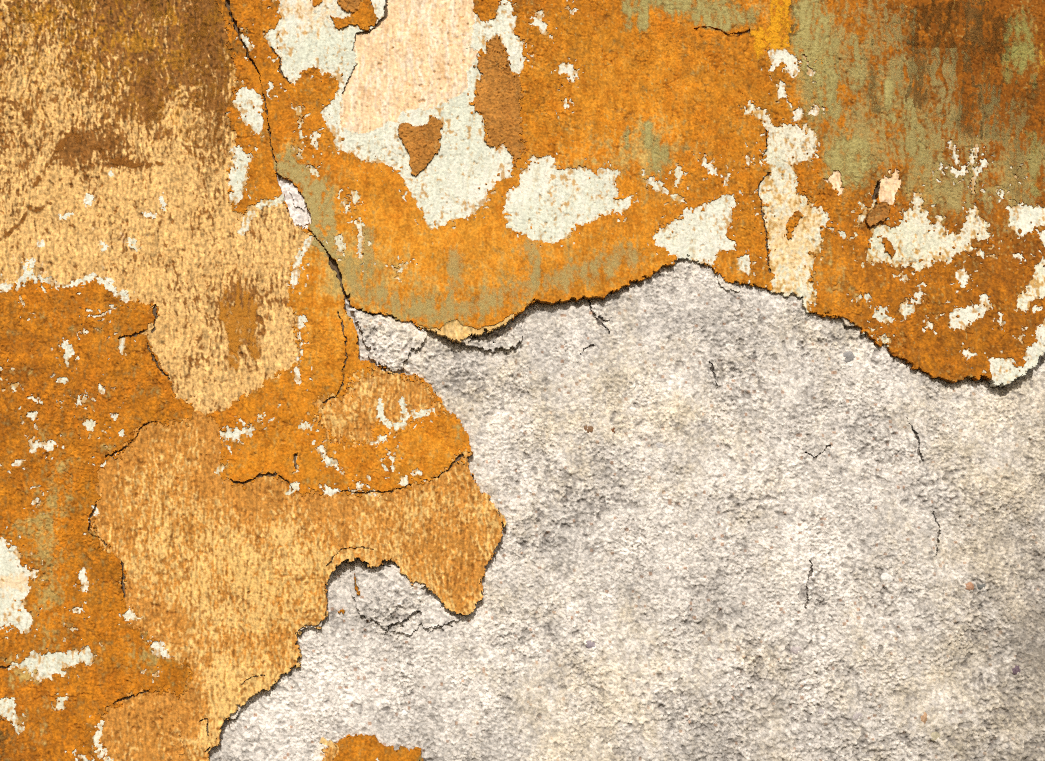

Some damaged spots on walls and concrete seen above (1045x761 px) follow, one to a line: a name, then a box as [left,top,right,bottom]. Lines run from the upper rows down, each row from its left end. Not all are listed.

crack [225,0,291,180]
peeling [263,0,639,248]
crack [307,229,351,403]
peeling [737,249,756,276]
peeling [851,292,896,328]
peeling [854,139,1000,321]
peeling [922,293,1006,335]
peeling [0,359,64,473]
crack [231,453,298,490]
crack [339,454,464,495]
peeling [0,526,44,639]
peeling [4,567,103,710]